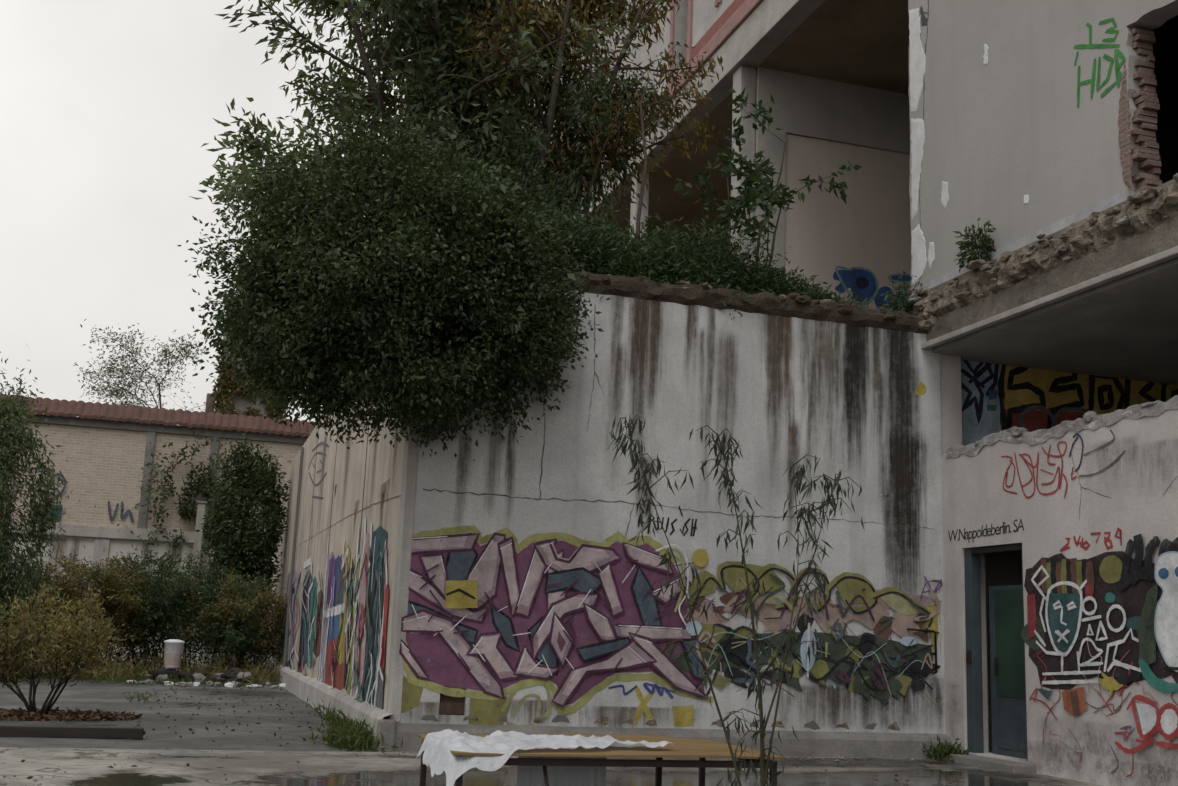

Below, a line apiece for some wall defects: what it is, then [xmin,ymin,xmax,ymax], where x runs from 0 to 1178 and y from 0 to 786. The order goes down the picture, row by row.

spalling [561,6,1178,334]
water stain [613,296,660,416]
water stain [701,307,734,418]
water stain [491,421,515,489]
water stain [809,320,922,575]